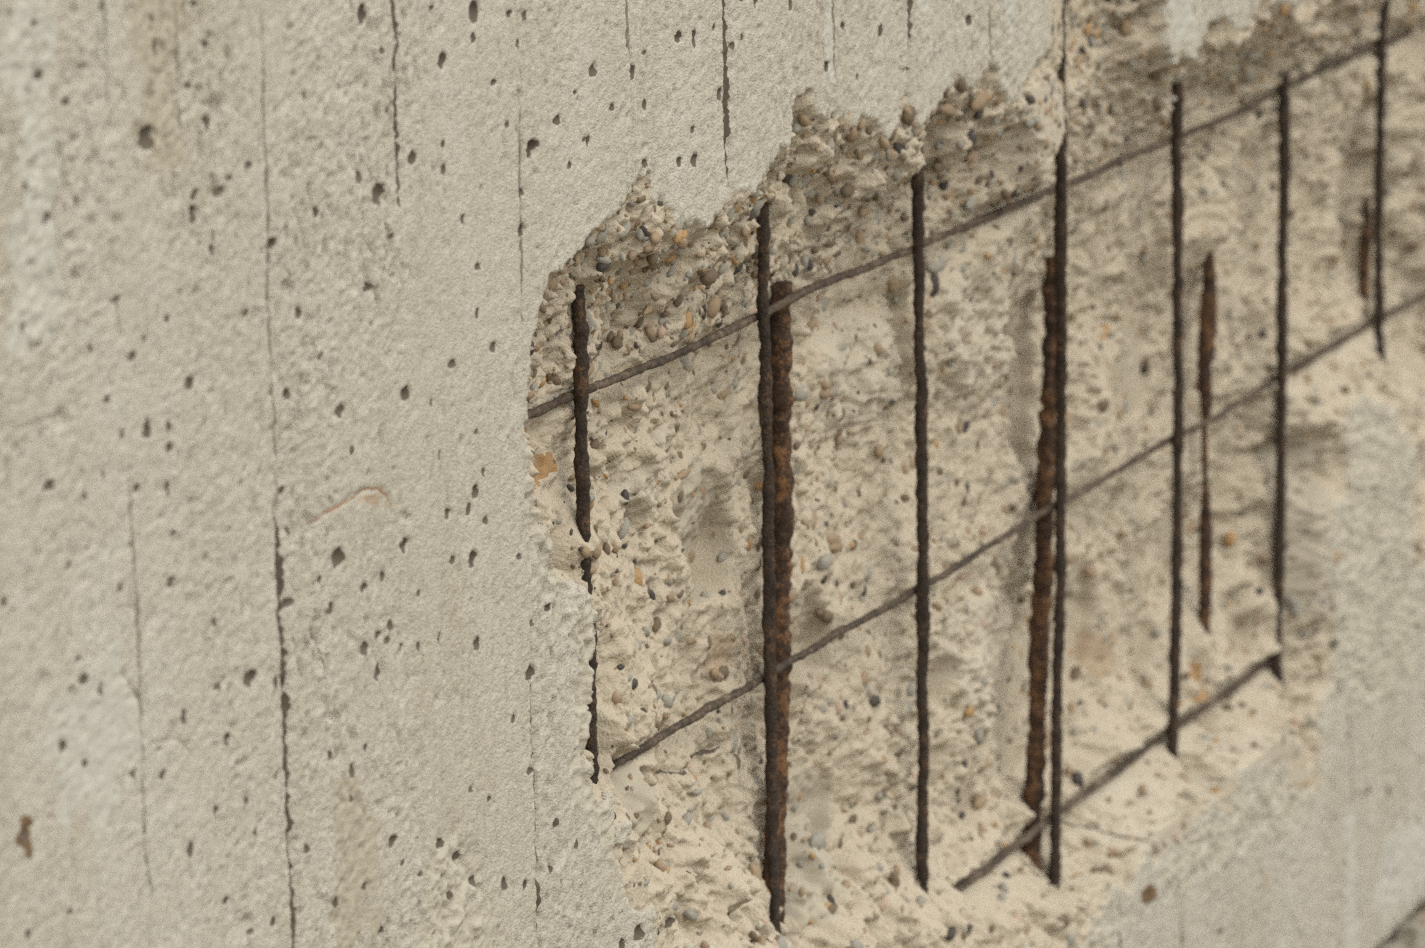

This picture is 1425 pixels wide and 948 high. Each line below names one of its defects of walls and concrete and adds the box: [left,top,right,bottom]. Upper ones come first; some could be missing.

crack [260,17,391,948]
spalling [523,0,1425,948]